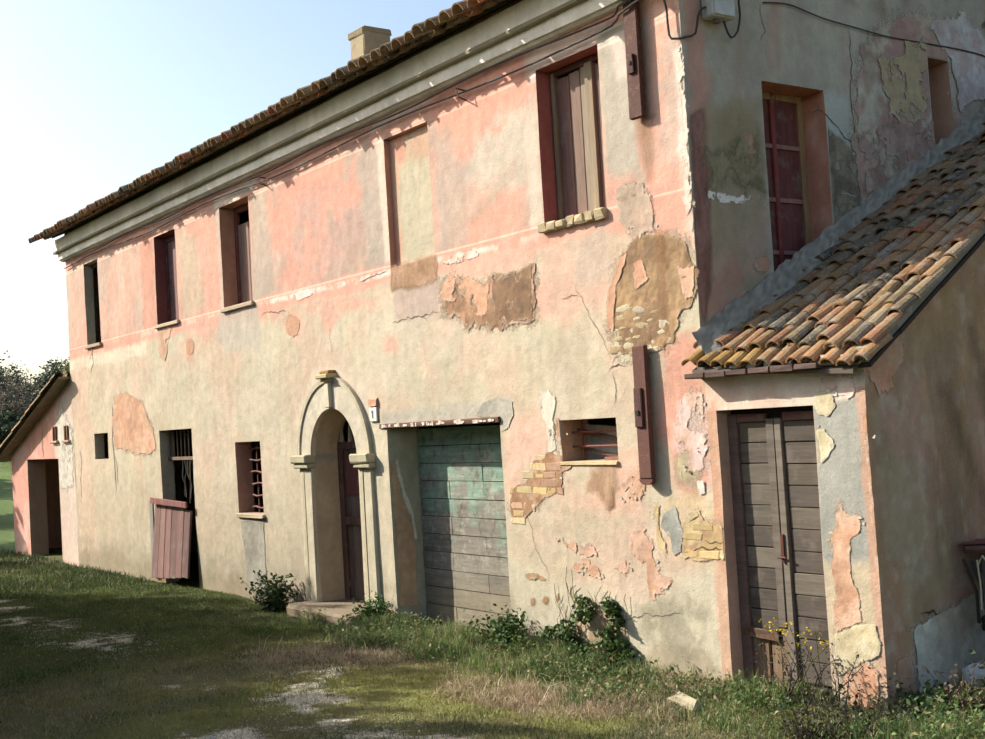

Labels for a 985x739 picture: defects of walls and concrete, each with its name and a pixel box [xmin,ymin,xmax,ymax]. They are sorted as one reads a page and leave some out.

peeling [849,4,985,205]
peeling [603,43,700,365]
crack [564,287,623,405]
peeling [111,392,157,456]
spalling [507,417,571,525]
peeling [675,384,710,494]
peeling [556,536,604,580]
spalling [614,463,725,601]
peeling [826,408,884,711]
spalling [906,587,985,703]